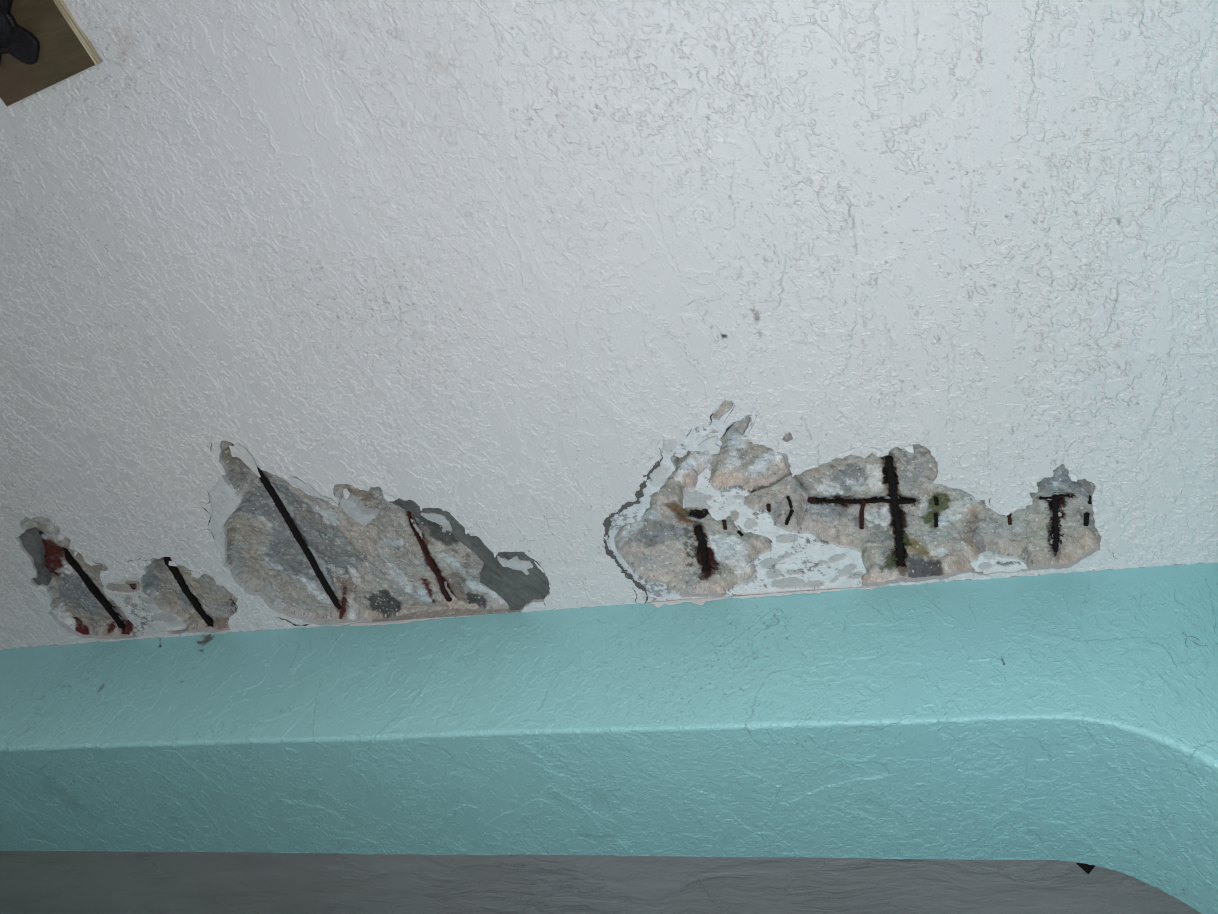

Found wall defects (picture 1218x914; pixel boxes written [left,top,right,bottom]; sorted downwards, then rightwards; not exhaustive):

spalling [19,440,550,640]
spalling [608,400,1100,608]